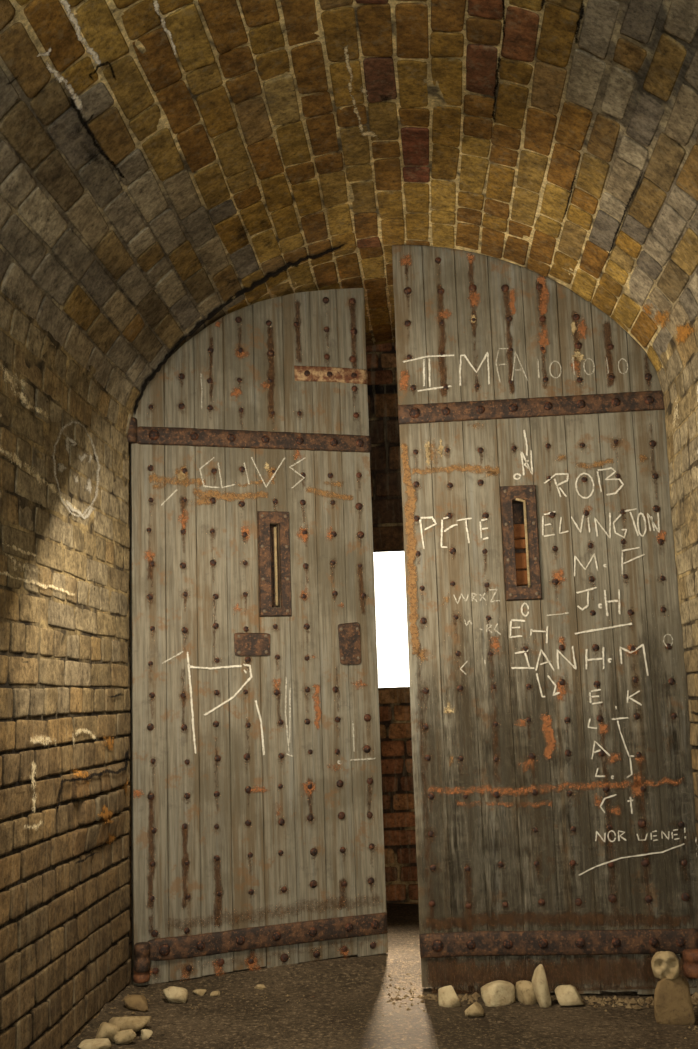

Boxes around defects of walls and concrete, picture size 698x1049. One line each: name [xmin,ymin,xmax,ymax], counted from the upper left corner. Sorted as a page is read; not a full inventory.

crack [89,61,116,80]
crack [492,0,506,122]
crack [575,3,585,43]
crack [68,97,124,178]
corrosion [437,285,452,396]
corrosion [467,253,480,350]
corrosion [504,289,516,393]
corrosion [535,276,549,387]
corrosion [570,312,587,374]
corrosion [603,322,614,386]
corrosion [422,703,690,931]
corrosion [428,955,661,994]